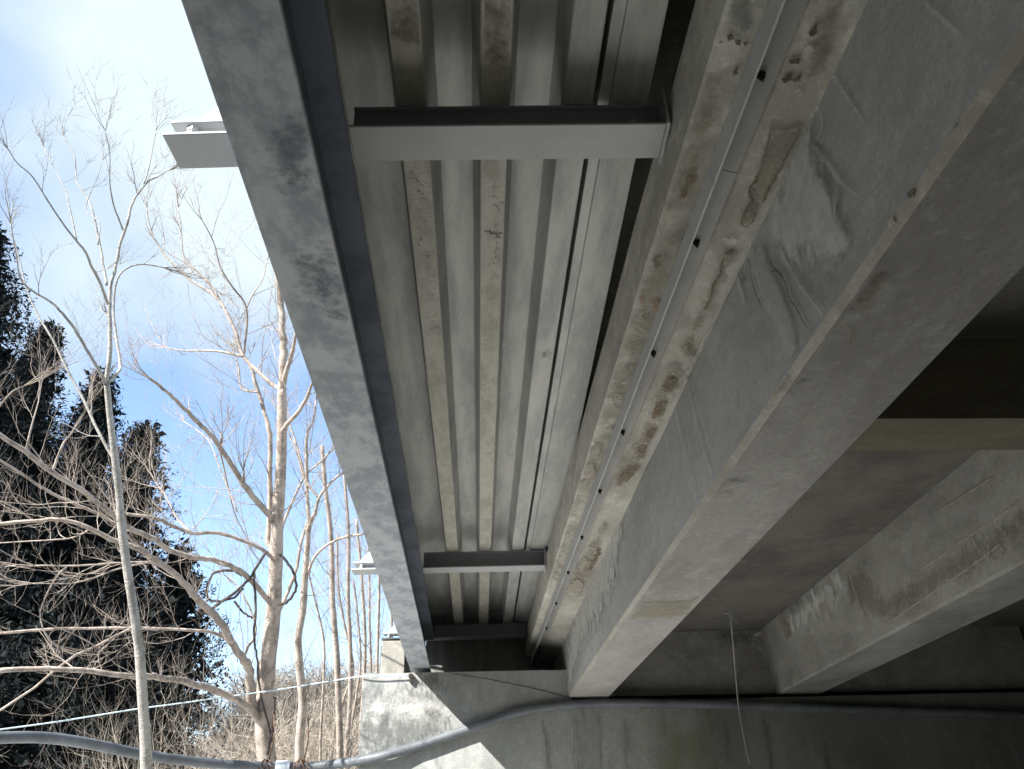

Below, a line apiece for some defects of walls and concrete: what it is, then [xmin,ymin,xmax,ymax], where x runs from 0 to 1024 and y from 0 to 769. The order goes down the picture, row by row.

spalling [781,58,801,83]
leakage [568,524,622,691]